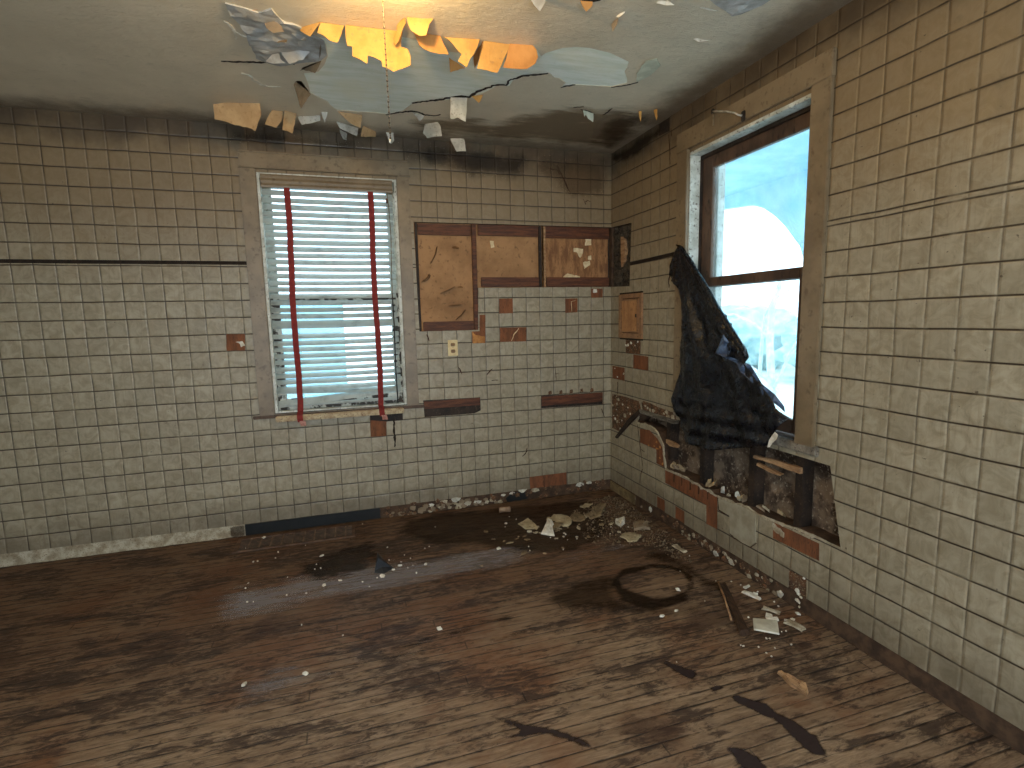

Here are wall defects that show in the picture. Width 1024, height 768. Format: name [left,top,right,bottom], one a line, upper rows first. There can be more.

peeling [213,3,629,152]
crack [386,73,638,116]
peeling [639,109,670,136]
peeling [499,299,513,314]
peeling [565,298,577,313]
peeling [226,334,245,351]
peeling [472,315,485,343]
peeling [500,327,526,342]
peeling [613,340,648,381]
peeling [370,413,403,437]
peeling [380,388,1024,755]